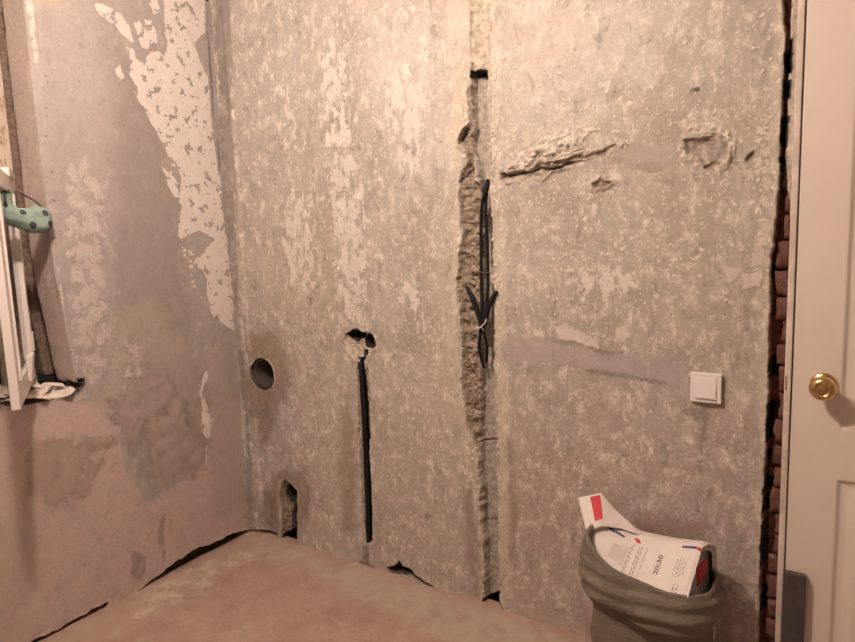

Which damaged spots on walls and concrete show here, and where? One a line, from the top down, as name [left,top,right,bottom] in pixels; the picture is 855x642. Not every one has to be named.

peeling [94,0,234,330]
peeling [384,241,429,331]
spalling [423,49,638,463]
flaking render [677,0,798,642]
crack [130,527,249,595]